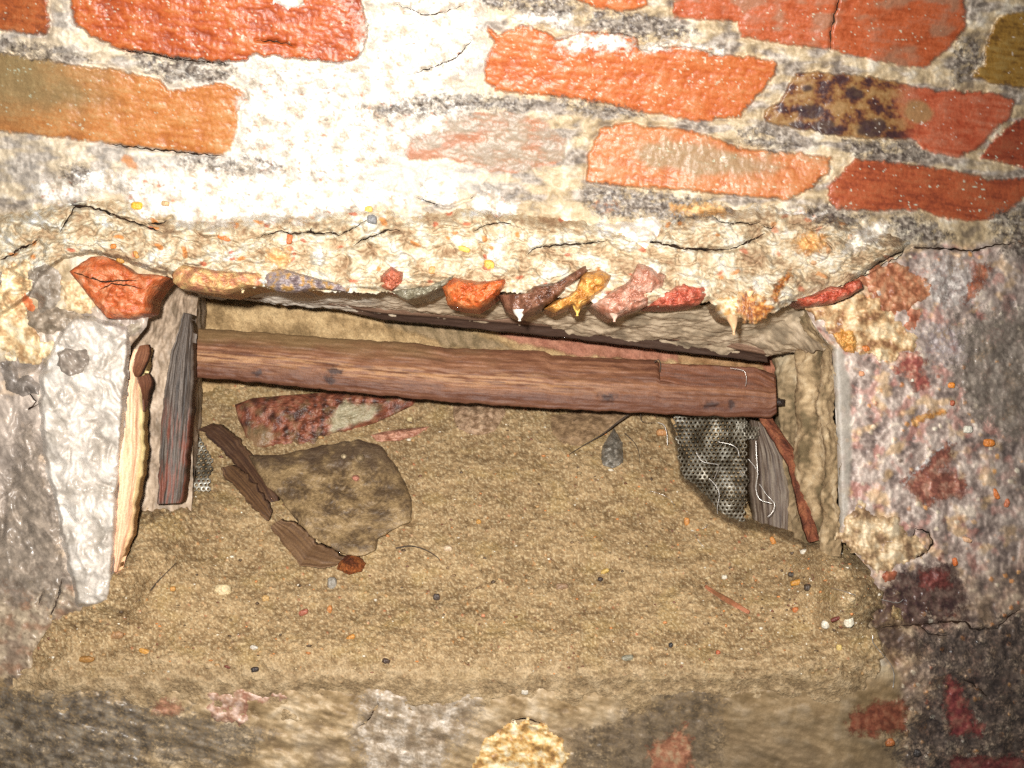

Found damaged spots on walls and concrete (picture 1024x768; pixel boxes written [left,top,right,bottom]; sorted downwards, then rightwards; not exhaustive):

crack [60,204,167,232]
crack [0,240,37,260]
crack [258,220,400,246]
crack [527,240,607,255]
crack [650,217,774,251]
spalling [967,264,991,300]
spalling [0,199,932,607]
crack [879,609,1020,636]
damp [872,562,1024,768]